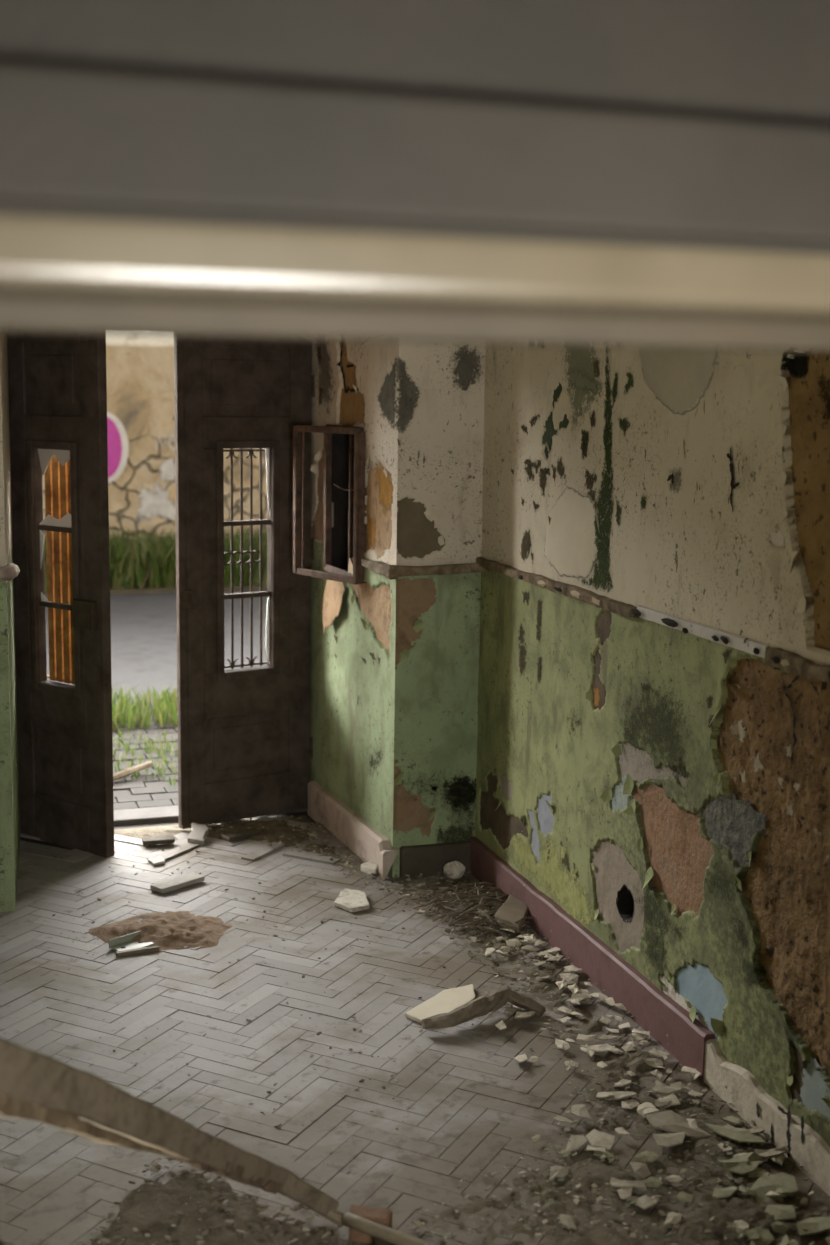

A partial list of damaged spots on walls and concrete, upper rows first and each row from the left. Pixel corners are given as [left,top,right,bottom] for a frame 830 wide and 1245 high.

crack [337,340,366,394]
spalling [365,457,446,559]
peeling [511,382,597,524]
spalling [775,351,830,651]
spalling [322,577,436,667]
peeling [518,530,612,710]
spalling [661,618,689,633]
water stain [398,774,476,844]
spalling [480,635,830,1120]
peeling [470,925,830,1245]